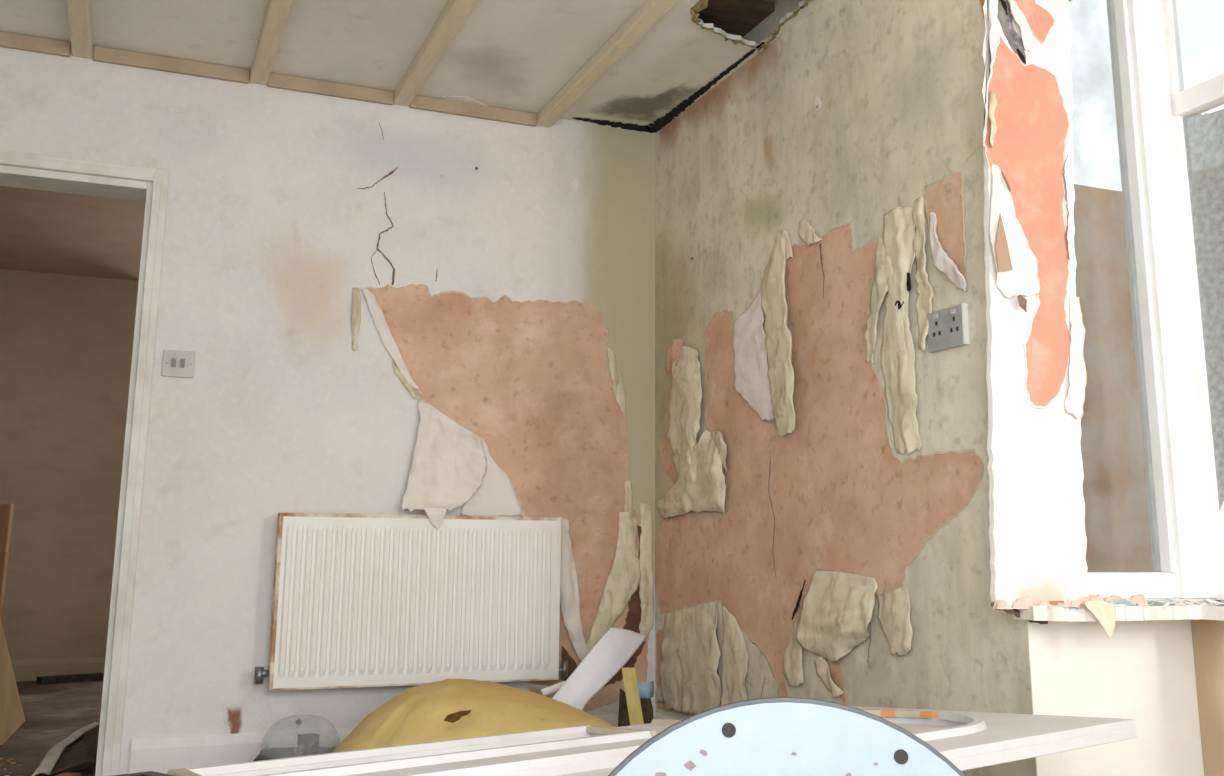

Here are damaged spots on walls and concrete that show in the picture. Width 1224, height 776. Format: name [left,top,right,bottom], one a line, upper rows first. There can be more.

crack [357,167,398,285]
flaking render [926,173,966,281]
flaking render [980,0,1087,419]
flaking render [370,285,640,686]
flaking render [655,224,984,697]
flaking render [582,630,666,712]
flaking render [816,656,846,705]